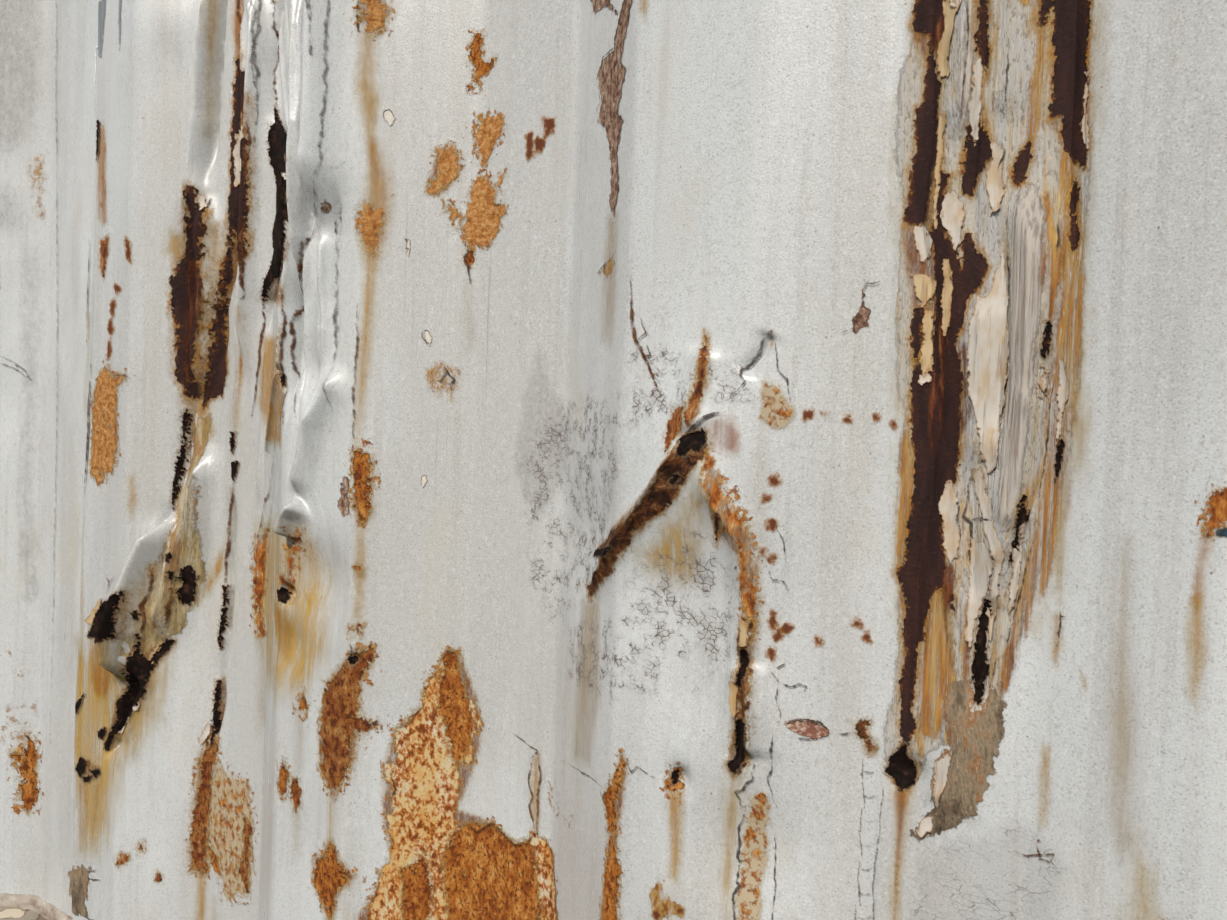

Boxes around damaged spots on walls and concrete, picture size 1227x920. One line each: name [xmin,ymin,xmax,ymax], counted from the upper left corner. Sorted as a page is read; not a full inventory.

corrosion [423,109,509,282]
corrosion [464,30,497,96]
corrosion [524,117,555,160]
corrosion [84,235,128,493]
corrosion [337,438,381,528]
corrosion [664,329,710,452]
corrosion [696,431,794,661]
peeling [884,0,1091,842]
corrosion [248,464,558,920]
corrosion [185,731,259,912]
corrosion [599,748,628,920]
corrosion [735,792,770,920]